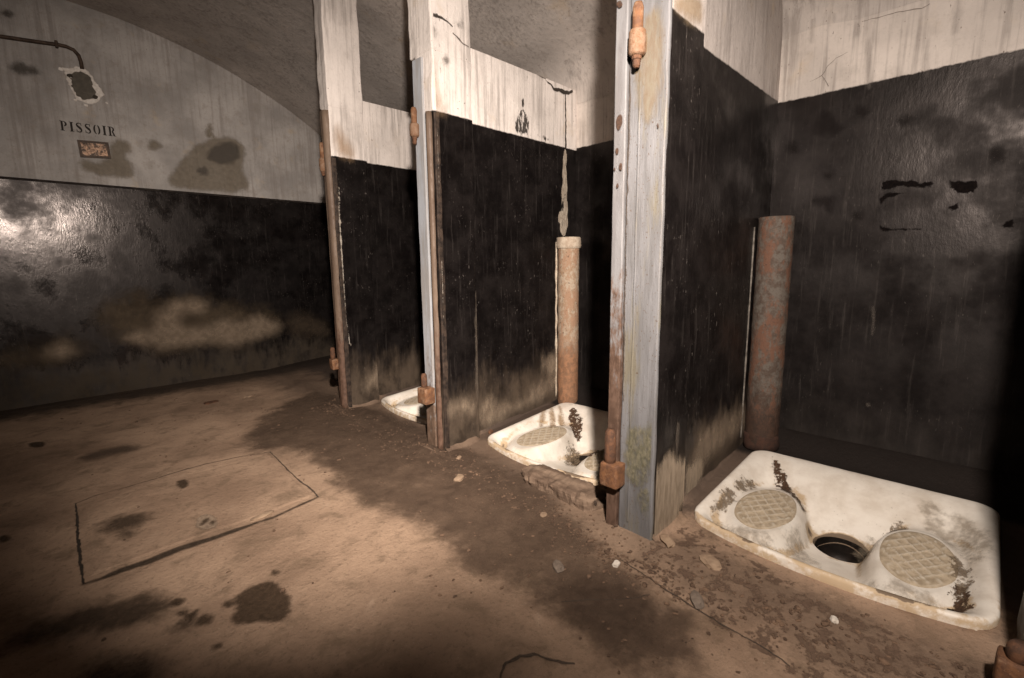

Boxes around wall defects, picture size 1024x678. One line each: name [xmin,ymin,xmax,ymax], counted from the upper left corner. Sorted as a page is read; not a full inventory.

spalling [58,66,108,107]
damp [83,141,132,176]
damp [170,126,248,191]
peeling [880,180,933,203]
peeling [949,181,977,210]
damp [99,295,327,350]
damp [249,393,693,666]